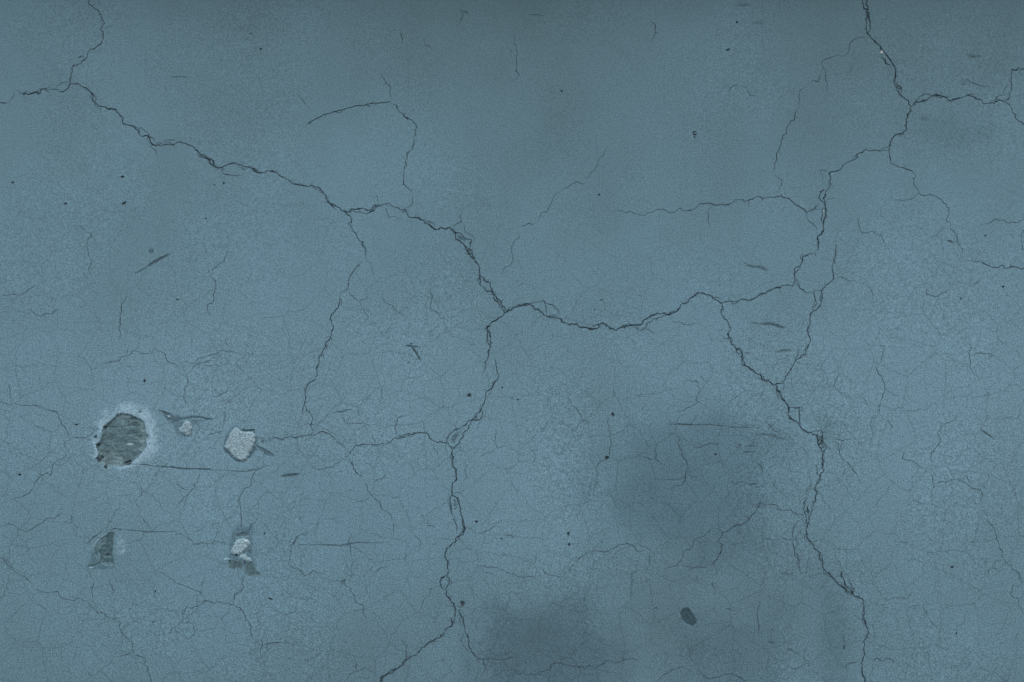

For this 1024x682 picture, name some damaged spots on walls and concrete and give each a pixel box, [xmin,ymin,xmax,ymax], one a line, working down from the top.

crack [306,69,418,169]
crack [695,0,1024,255]
crack [101,298,243,406]
crack [269,262,369,441]
crack [0,385,88,498]
spalling [75,396,171,477]
spalling [81,528,130,572]
peeling [223,531,261,576]
crack [311,359,517,682]
crack [902,420,1022,607]
crack [0,558,151,682]
crack [160,572,297,656]